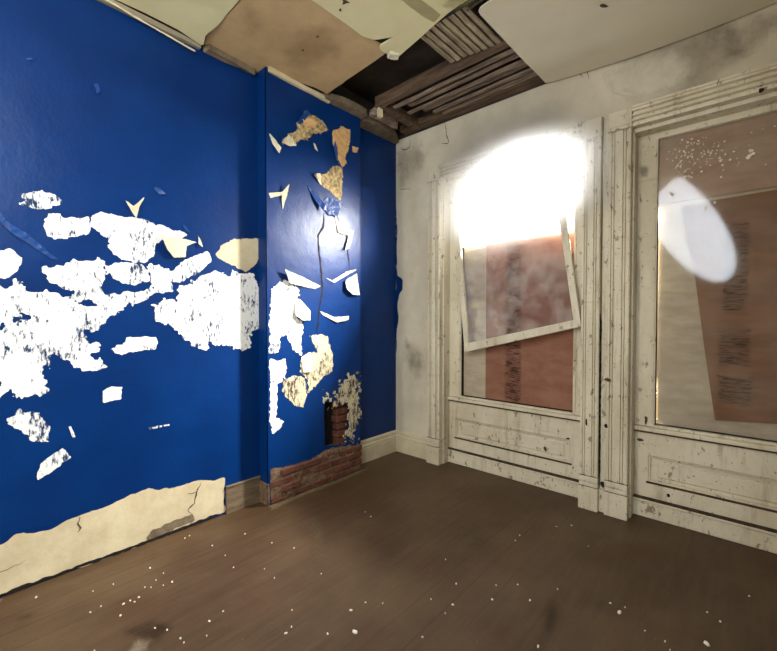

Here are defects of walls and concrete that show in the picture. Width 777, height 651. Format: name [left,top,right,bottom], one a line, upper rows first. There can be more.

spalling [321,93,399,144]
peeling [269,109,358,250]
peeling [0,190,349,434]
crack [316,212,350,334]
peeling [327,269,360,295]
peeling [7,409,50,442]
peeling [37,448,71,480]
flaking render [259,371,362,506]
flaking render [0,477,226,594]